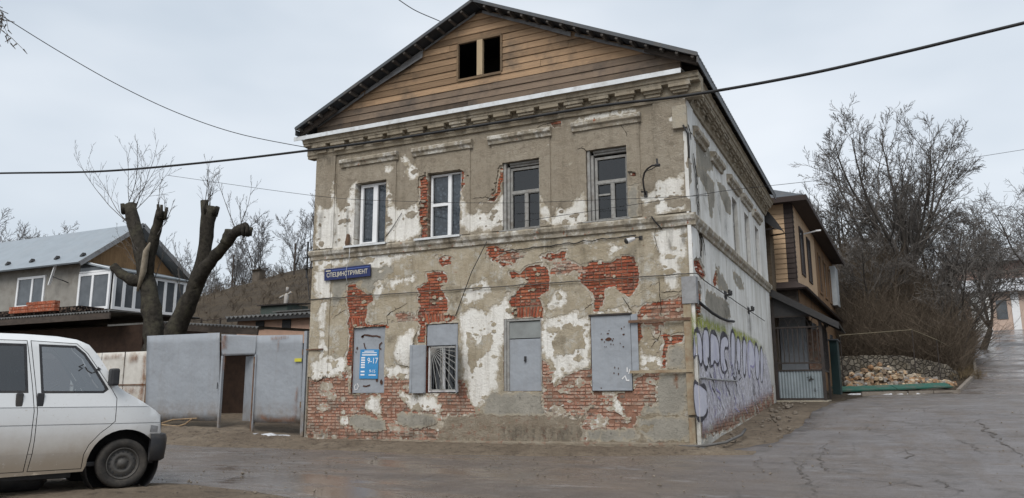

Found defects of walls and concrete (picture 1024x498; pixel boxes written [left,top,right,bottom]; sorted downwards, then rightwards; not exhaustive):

spalling [306,151,720,441]